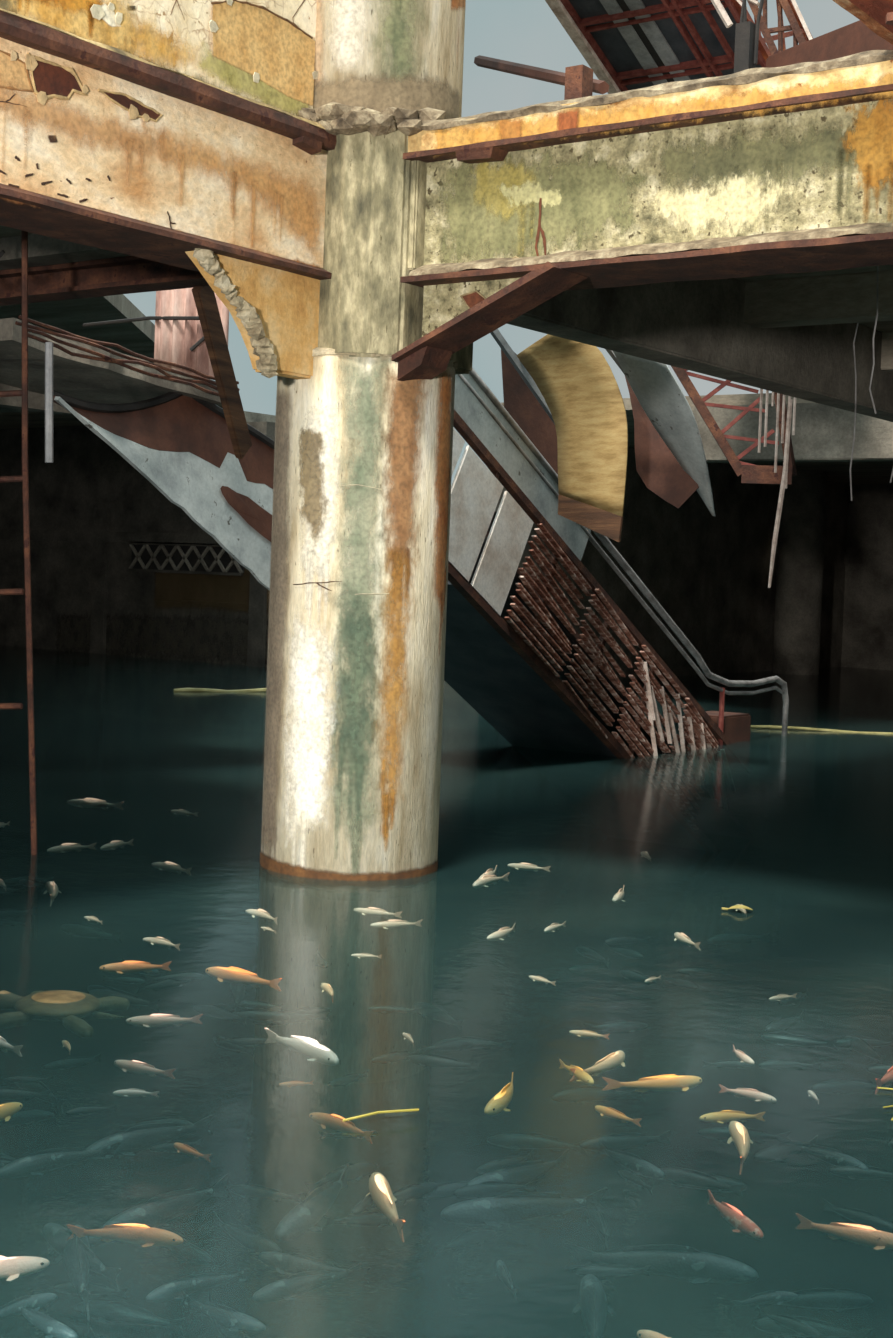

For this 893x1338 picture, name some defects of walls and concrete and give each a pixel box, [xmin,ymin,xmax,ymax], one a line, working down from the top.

spalling [0,50,163,122]
flaking render [90,2,123,27]
leakage [0,0,460,119]
flaking render [209,0,318,106]
leakage [437,150,647,263]
leakage [653,126,858,210]
corrosion [382,374,452,843]